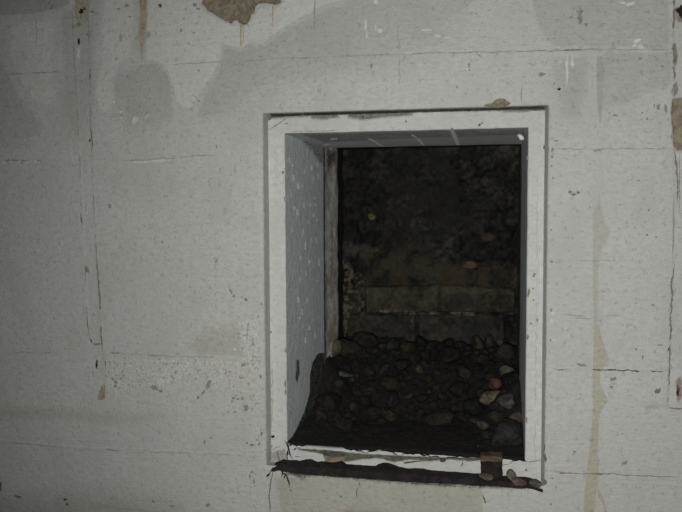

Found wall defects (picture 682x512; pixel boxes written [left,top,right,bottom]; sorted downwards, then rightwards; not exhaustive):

rust [119,0,151,61]
crack [72,3,219,391]
spalling [193,0,281,46]
leakage [584,196,612,512]
crack [554,148,682,410]
spalling [653,97,682,151]